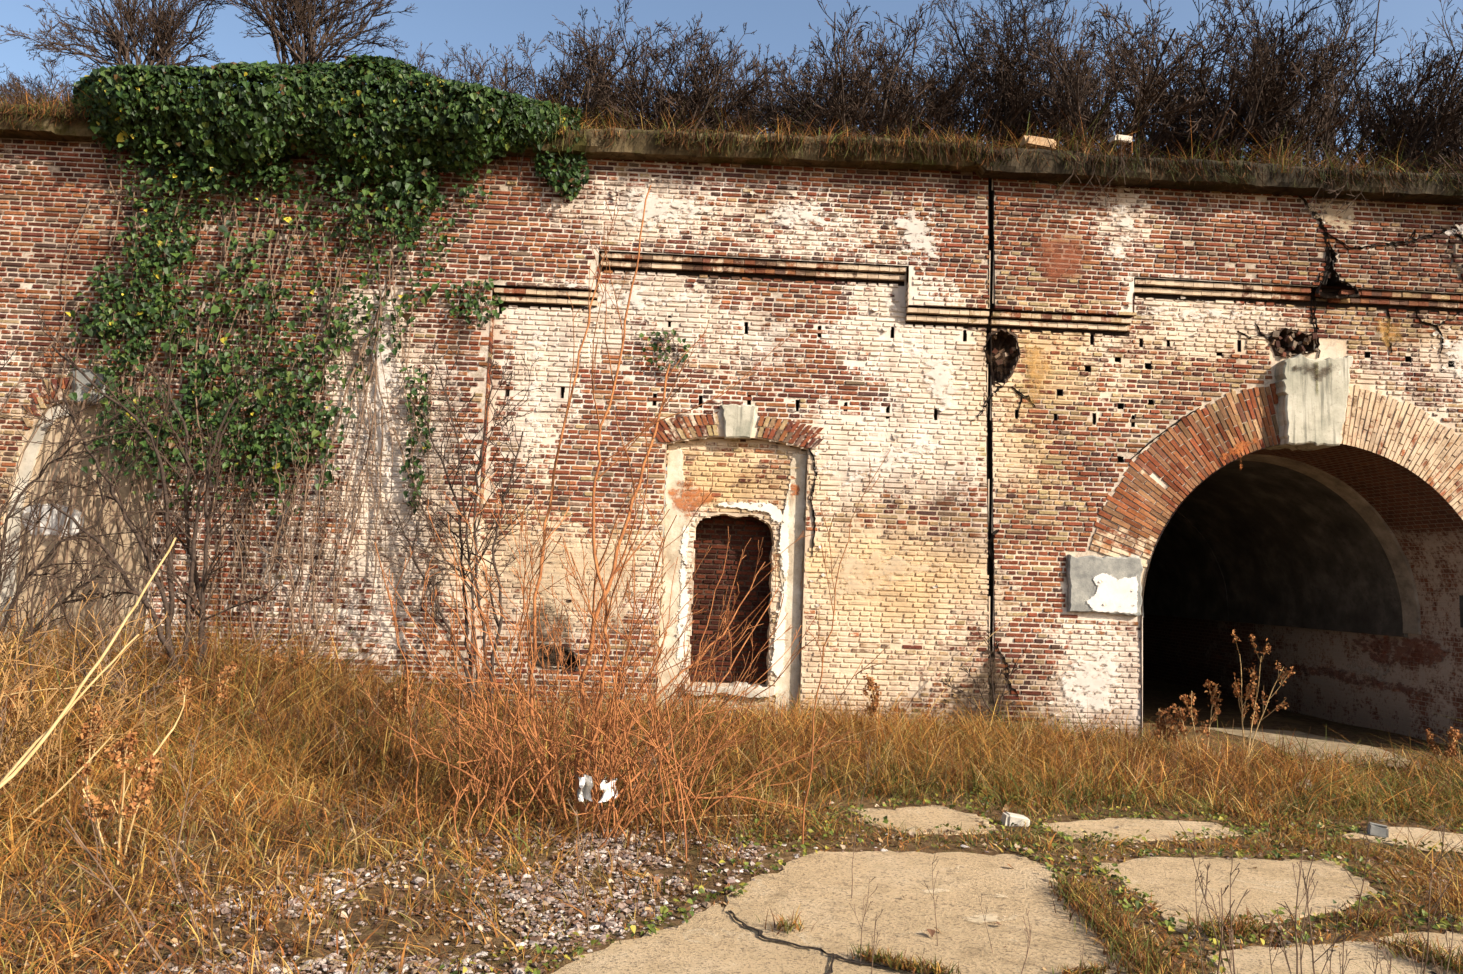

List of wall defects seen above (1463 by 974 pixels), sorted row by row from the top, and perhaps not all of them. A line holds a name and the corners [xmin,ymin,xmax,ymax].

crack [1298,196,1463,358]
peeling [872,298,971,412]
spalling [983,327,1021,388]
spalling [1128,296,1319,358]
crack [1237,324,1271,341]
spalling [1087,573,1138,614]
crack [728,910,934,974]